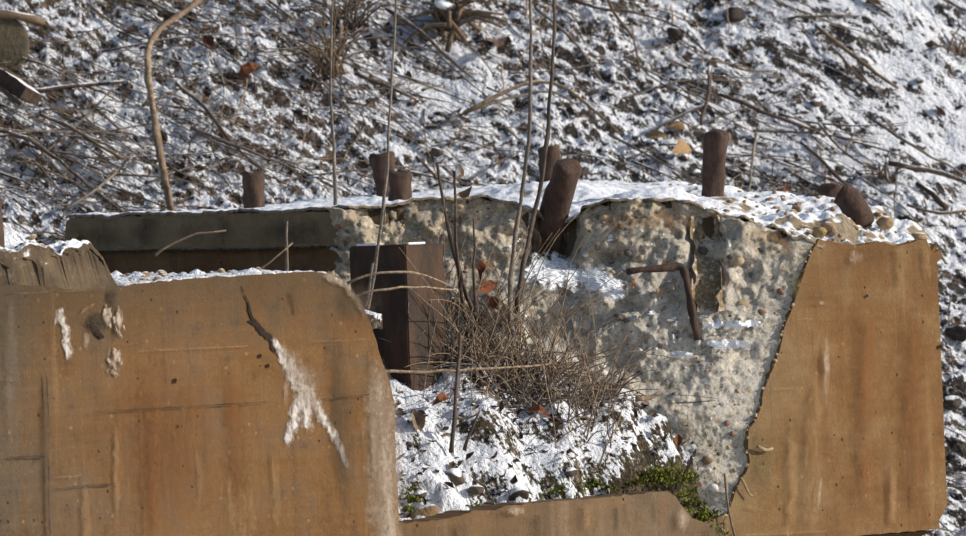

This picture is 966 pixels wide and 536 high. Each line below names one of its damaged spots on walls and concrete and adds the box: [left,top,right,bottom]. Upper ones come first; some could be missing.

spalling [578,206,658,278]
spalling [724,239,763,266]
leakage [55,309,72,357]
crack [242,289,278,354]
spalling [327,274,362,310]
rust [626,262,701,341]
spalling [729,296,777,329]
leakage [273,340,348,477]
spalling [682,400,736,491]